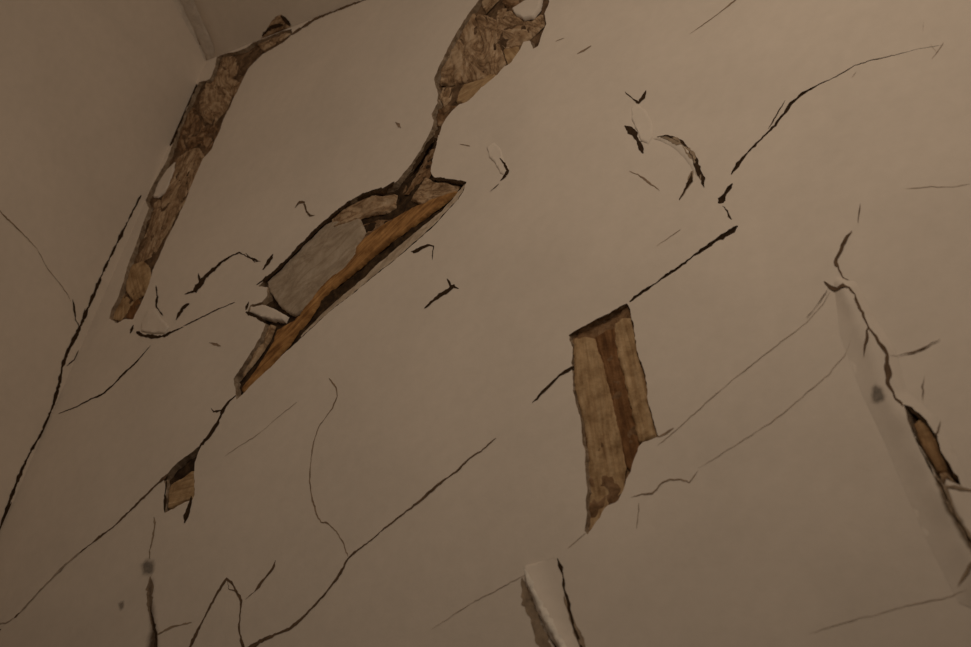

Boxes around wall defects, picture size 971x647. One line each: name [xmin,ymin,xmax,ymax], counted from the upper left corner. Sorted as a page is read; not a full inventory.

crack [0,195,273,529]
flaking render [163,446,201,513]
flaking render [109,0,292,334]
crack [0,378,496,647]
flaking render [234,0,549,400]
crack [424,279,459,308]
crack [532,366,574,403]
peeling [521,557,585,647]
flaking render [569,303,658,535]
crack [629,42,944,302]
crack [809,475,971,634]
flaking render [904,405,962,487]